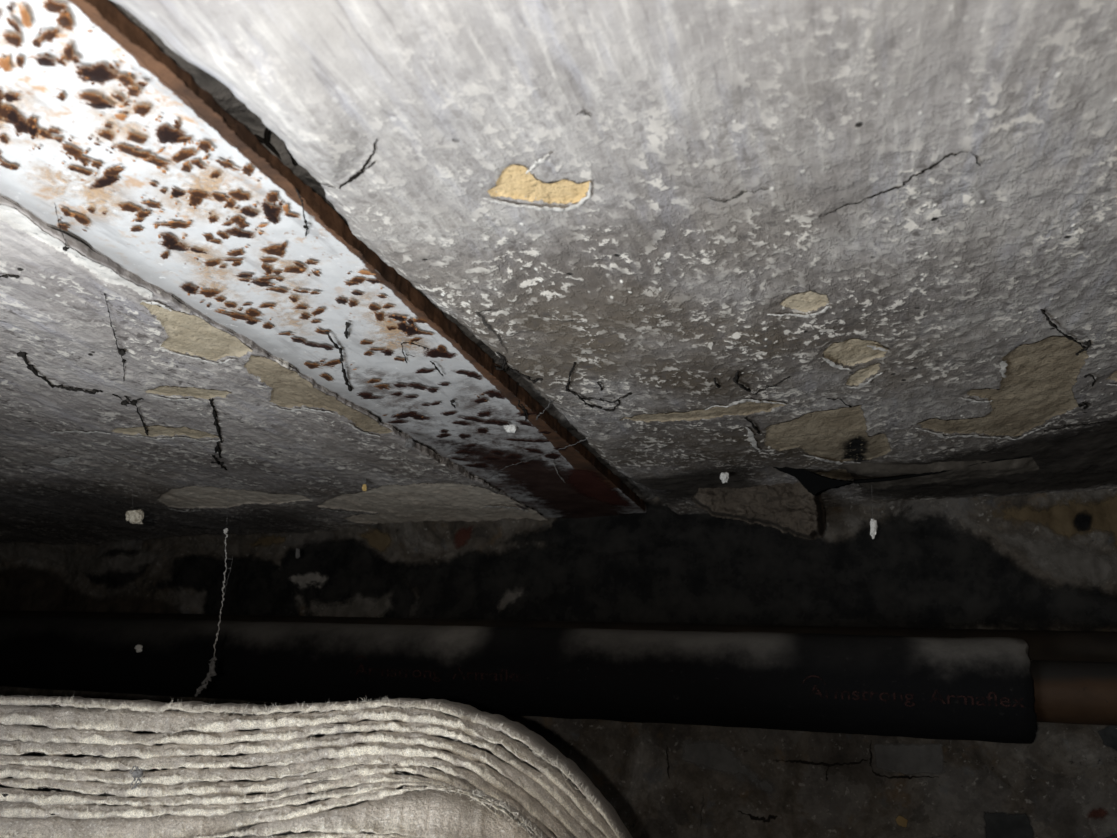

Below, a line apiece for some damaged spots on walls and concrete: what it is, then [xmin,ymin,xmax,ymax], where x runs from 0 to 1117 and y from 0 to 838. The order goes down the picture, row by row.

crack [254,118,377,189]
spalling [482,153,591,212]
crack [819,151,981,217]
rust [0,0,645,518]
spalling [0,204,391,437]
crack [0,195,543,516]
spalling [767,291,831,318]
spalling [821,338,889,389]
spalling [916,336,1088,440]
spalling [621,399,891,481]
spalling [691,472,826,540]
leakage [0,502,1117,631]